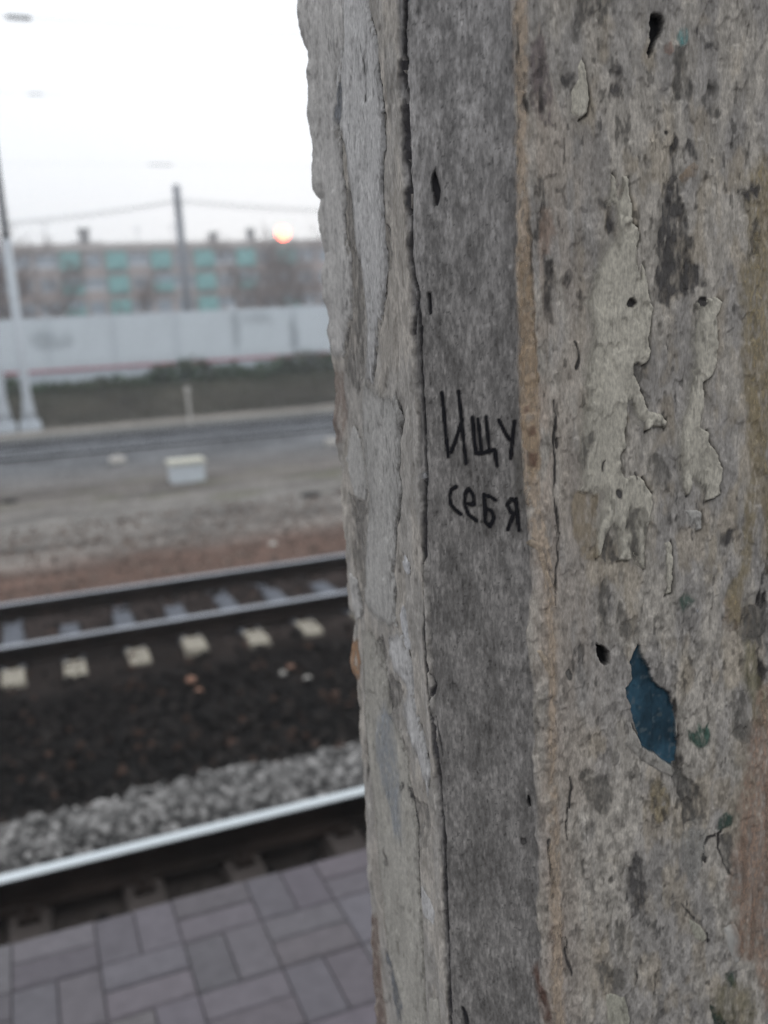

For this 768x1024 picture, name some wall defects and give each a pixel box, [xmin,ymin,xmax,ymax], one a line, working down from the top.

crack [360,0,429,567]
peeling [578,135,723,569]
crack [410,624,453,1024]
peeling [626,691,705,825]
crack [702,830,730,874]